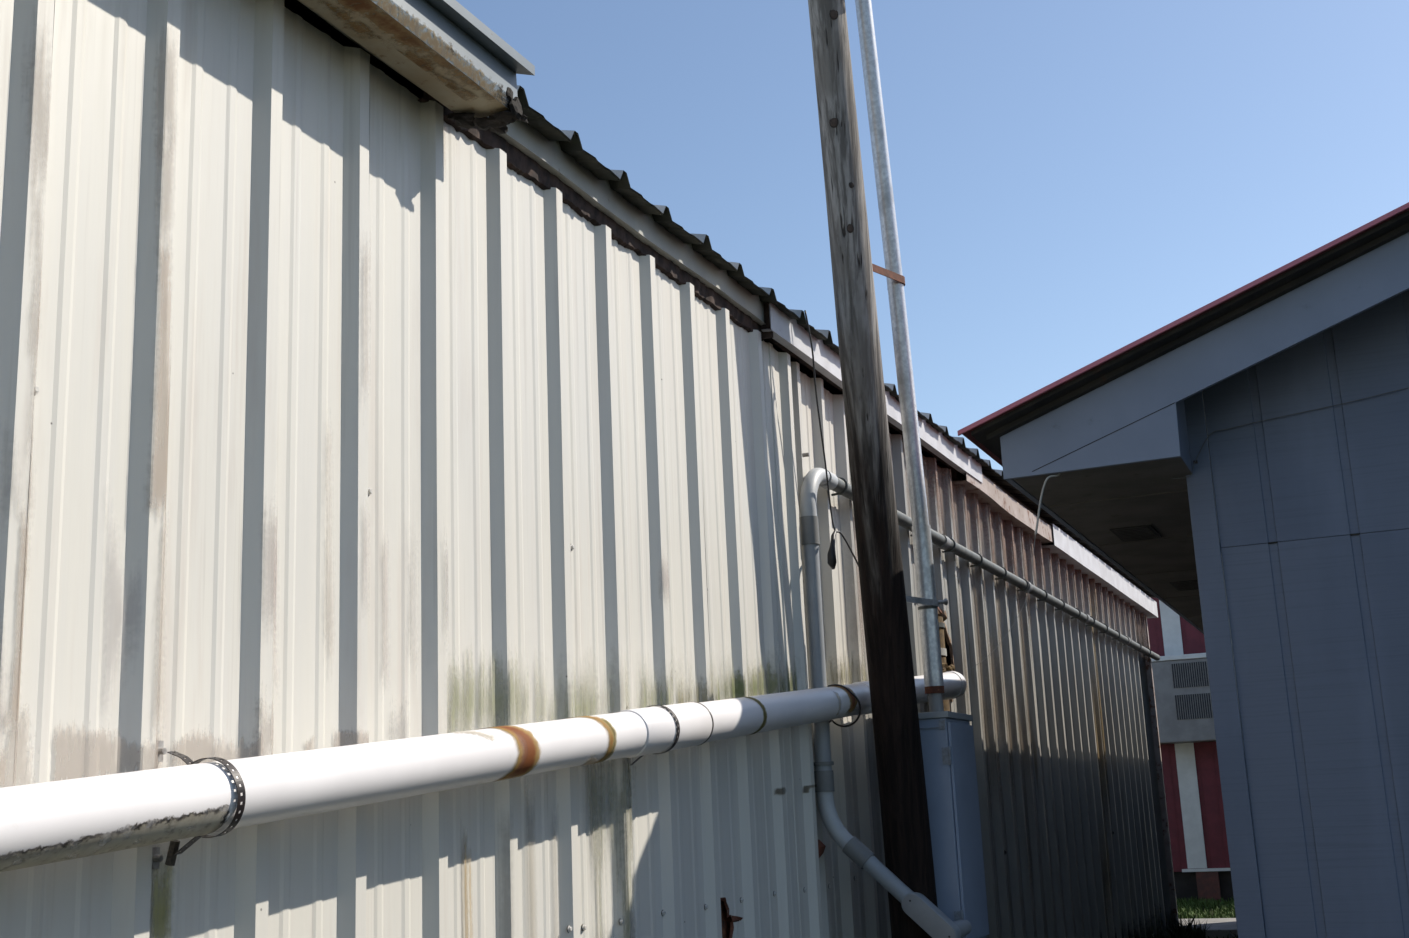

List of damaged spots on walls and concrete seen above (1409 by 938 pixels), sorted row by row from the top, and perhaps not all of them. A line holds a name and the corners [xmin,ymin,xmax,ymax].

rust [322,0,509,107]